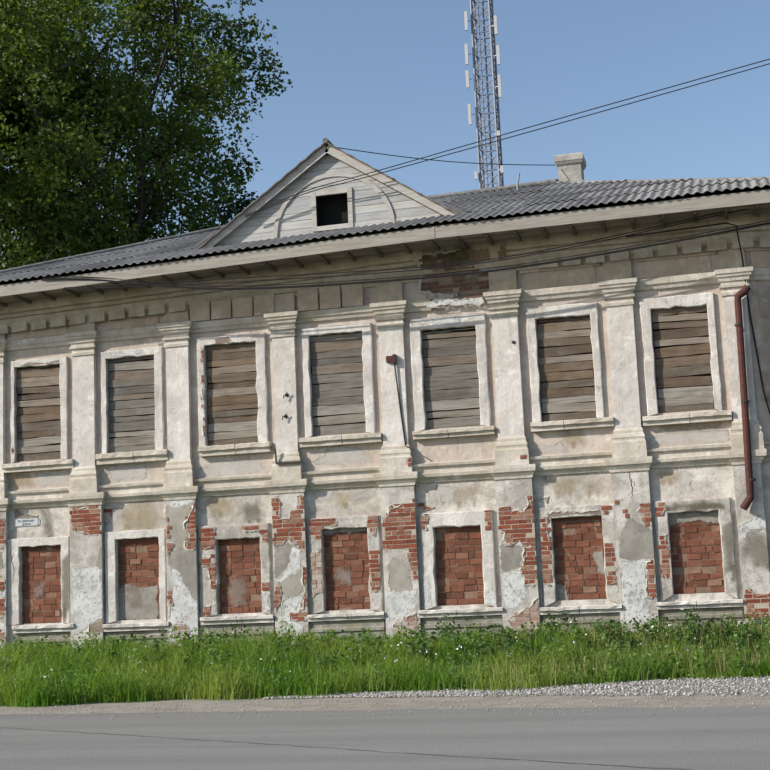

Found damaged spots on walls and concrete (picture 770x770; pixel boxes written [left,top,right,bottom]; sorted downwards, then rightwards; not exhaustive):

flaking render [413,247,496,327]
flaking render [0,509,38,641]
flaking render [70,505,121,537]
peeling [167,569,212,642]
peeling [165,499,217,589]
peeling [240,494,339,639]
flaking render [366,484,459,637]
flaking render [484,496,672,635]
flaking render [743,587,770,620]